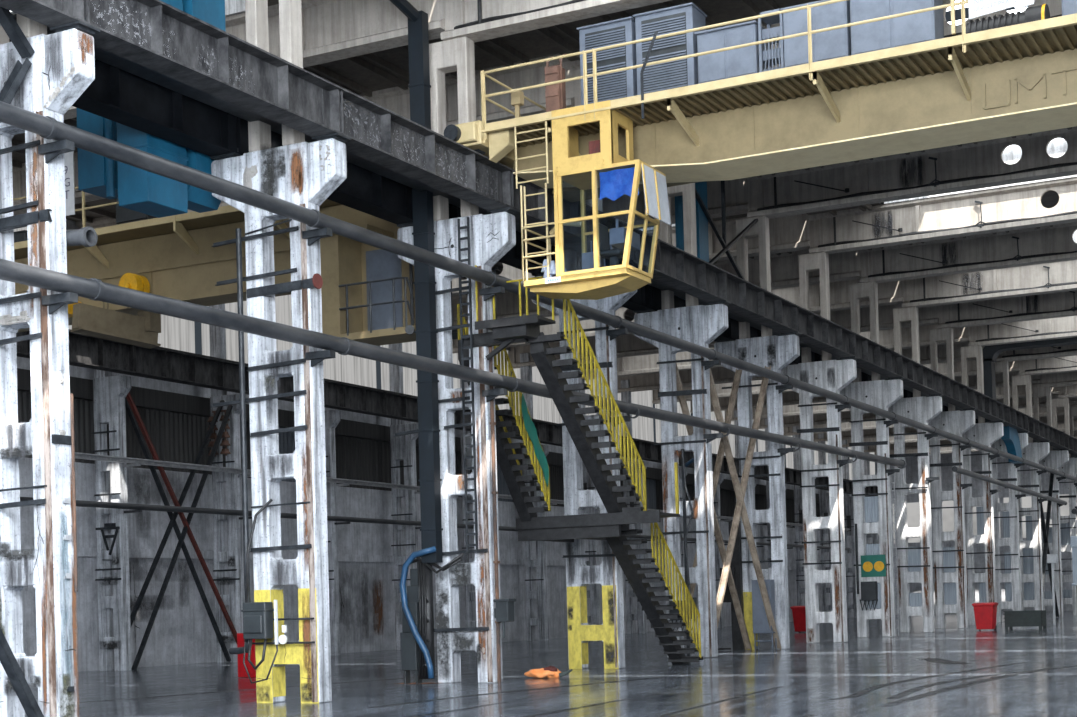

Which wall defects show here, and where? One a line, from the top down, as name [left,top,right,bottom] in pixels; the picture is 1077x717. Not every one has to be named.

corrosion [79,33,93,63]
corrosion [291,149,304,195]
corrosion [373,581,383,634]